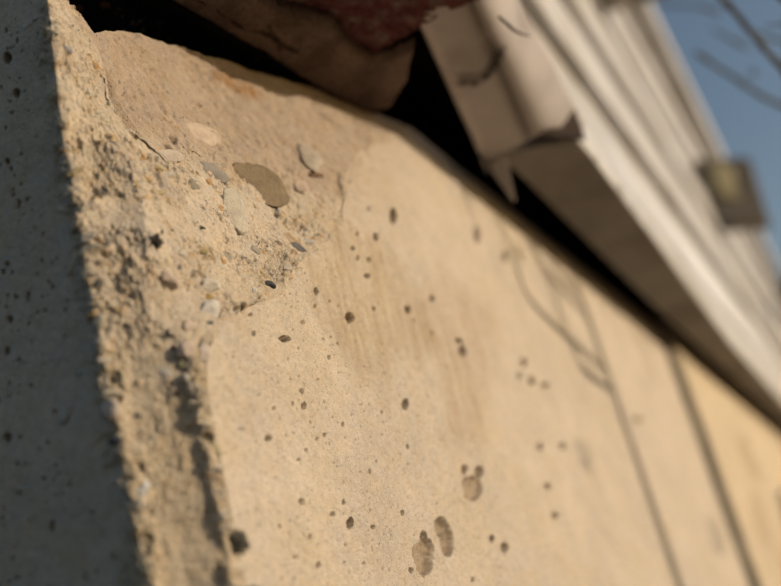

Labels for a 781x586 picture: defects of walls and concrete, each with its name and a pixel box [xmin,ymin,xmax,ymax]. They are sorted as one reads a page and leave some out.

spalling [23,0,413,586]